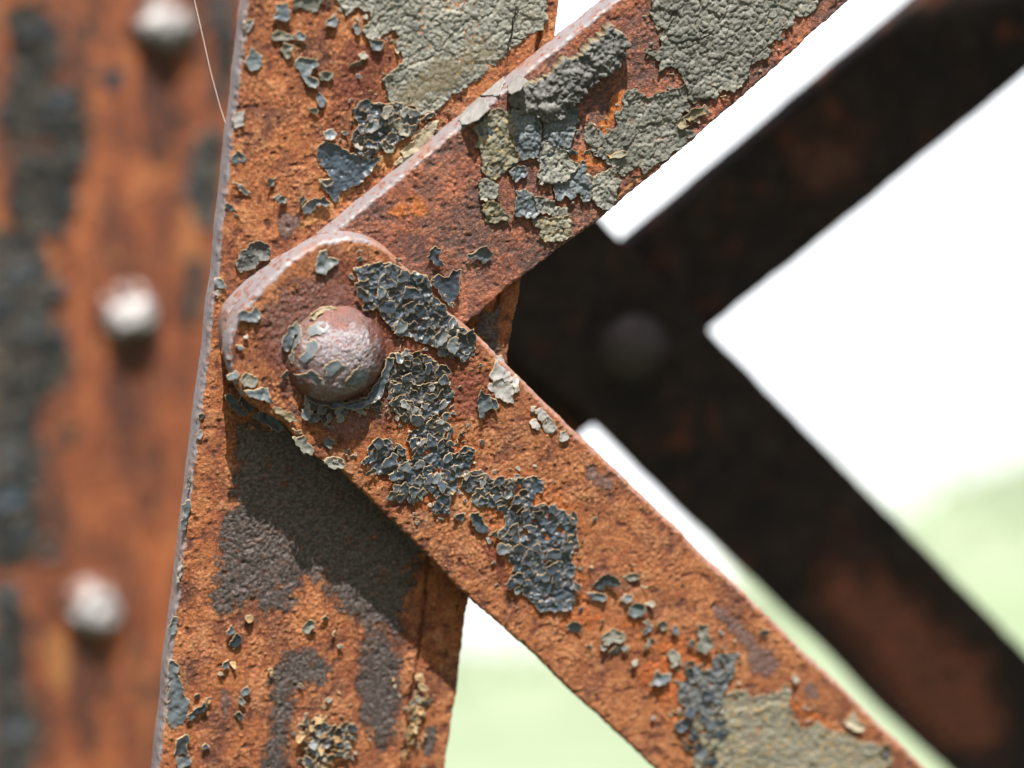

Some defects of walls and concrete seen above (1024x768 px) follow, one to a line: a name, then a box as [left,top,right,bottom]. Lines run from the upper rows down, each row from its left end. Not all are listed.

peeling [206,0,263,105]
peeling [271,0,339,114]
corrosion [298,133,417,229]
corrosion [327,38,394,128]
corrosion [389,196,429,219]
peeling [267,22,631,243]
corrosion [574,150,602,172]
corrosion [598,90,626,134]
corrosion [248,252,501,475]
peeling [224,246,742,768]
peeling [166,659,211,768]
peeling [842,711,866,733]